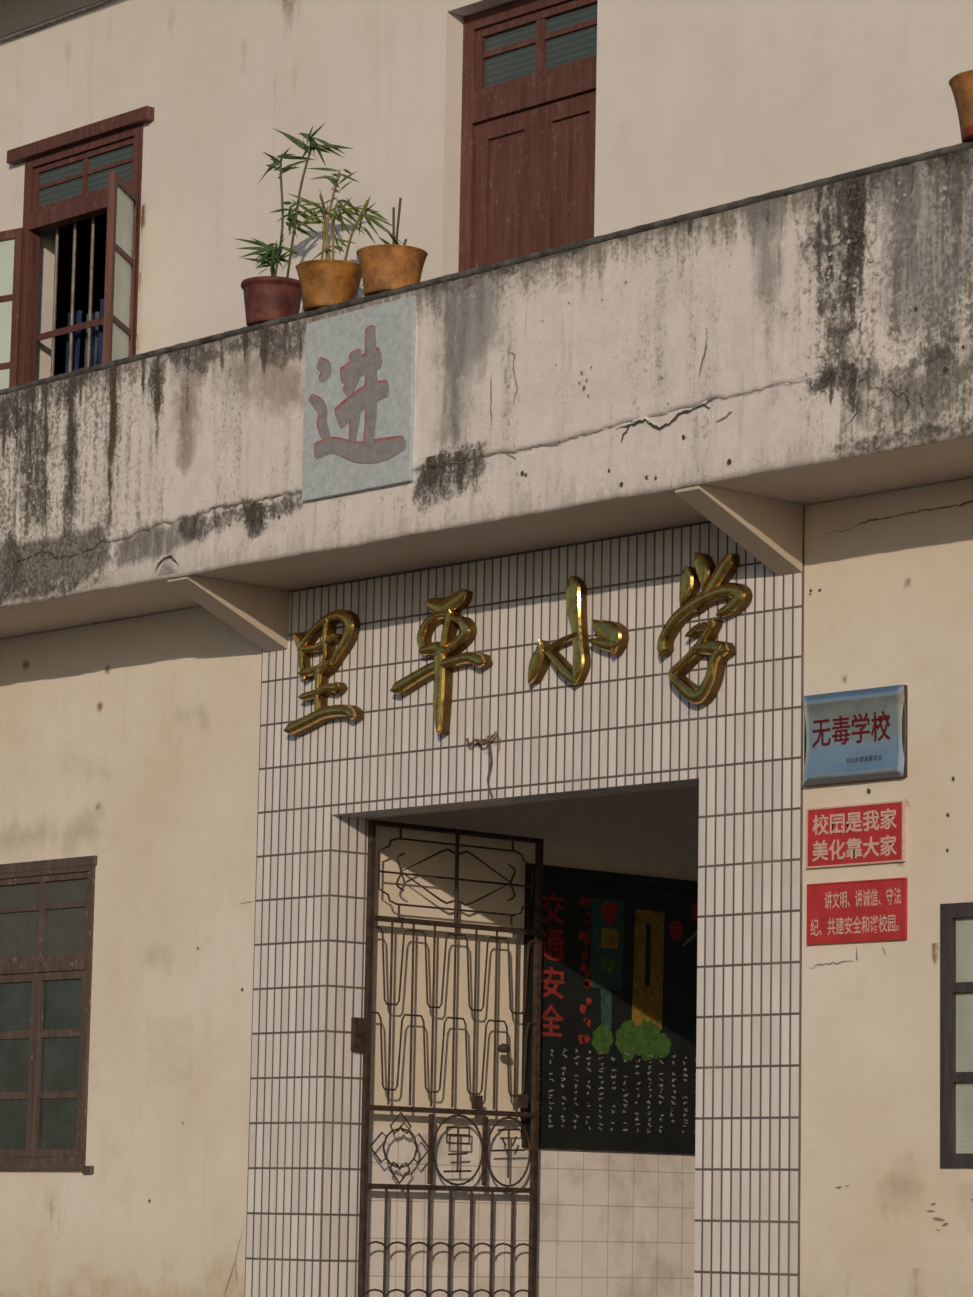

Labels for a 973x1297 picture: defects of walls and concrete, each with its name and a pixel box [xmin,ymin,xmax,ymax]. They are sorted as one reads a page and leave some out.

damp [0,365,301,605]
damp [141,318,314,444]
damp [413,442,486,509]
crack [417,329,827,499]
damp [801,148,973,452]
crack [824,499,973,534]